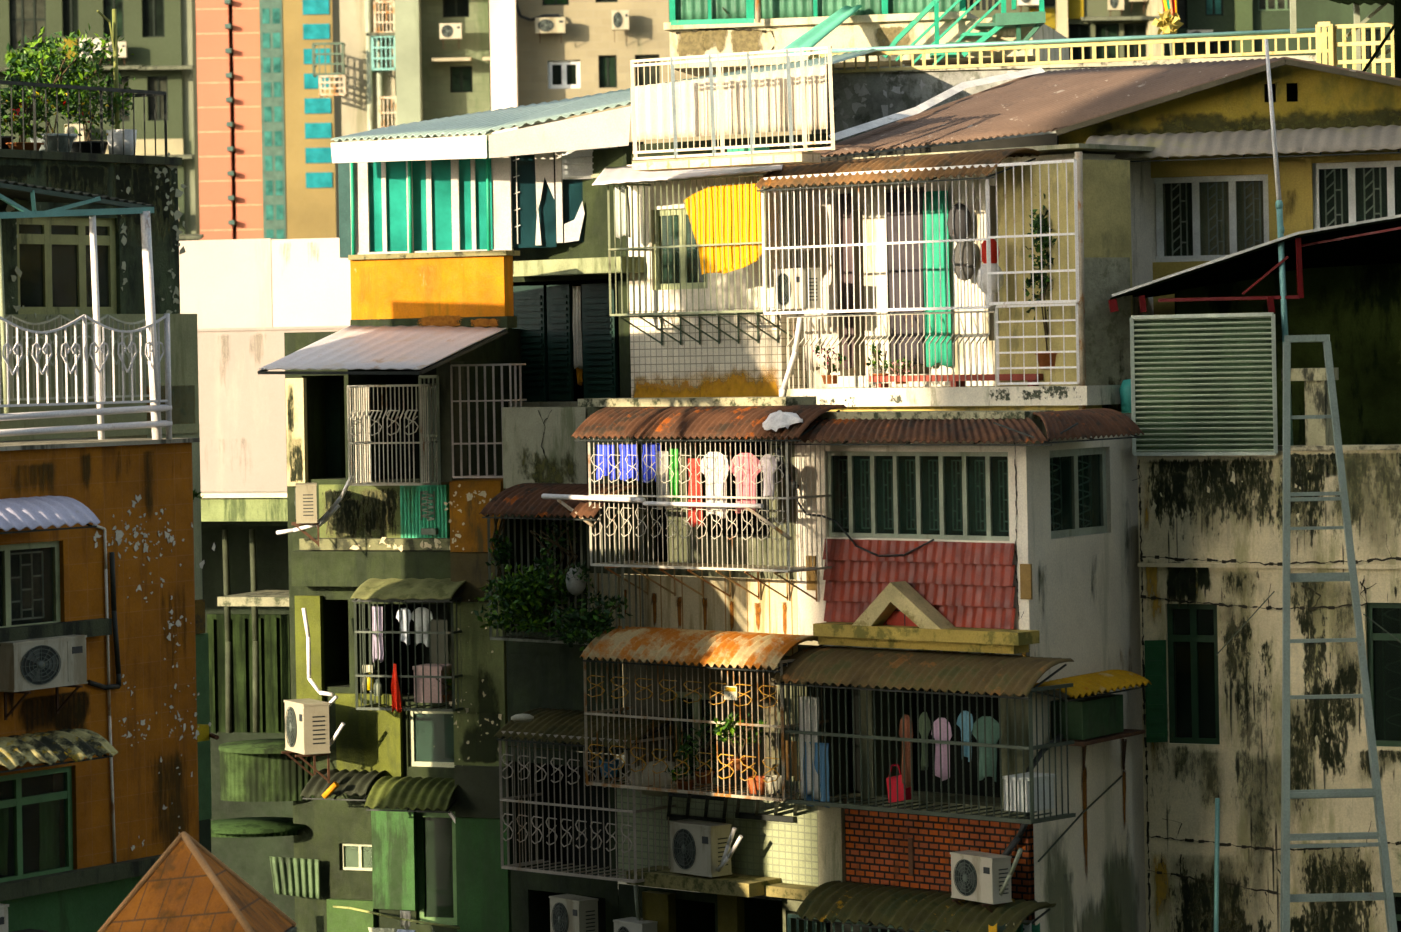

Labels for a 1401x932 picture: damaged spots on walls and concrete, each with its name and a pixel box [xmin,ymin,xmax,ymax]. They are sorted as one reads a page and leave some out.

spalling [120,215,128,291]
spalling [154,152,188,314]
peeling [93,495,211,777]
water stain [1148,452,1401,932]